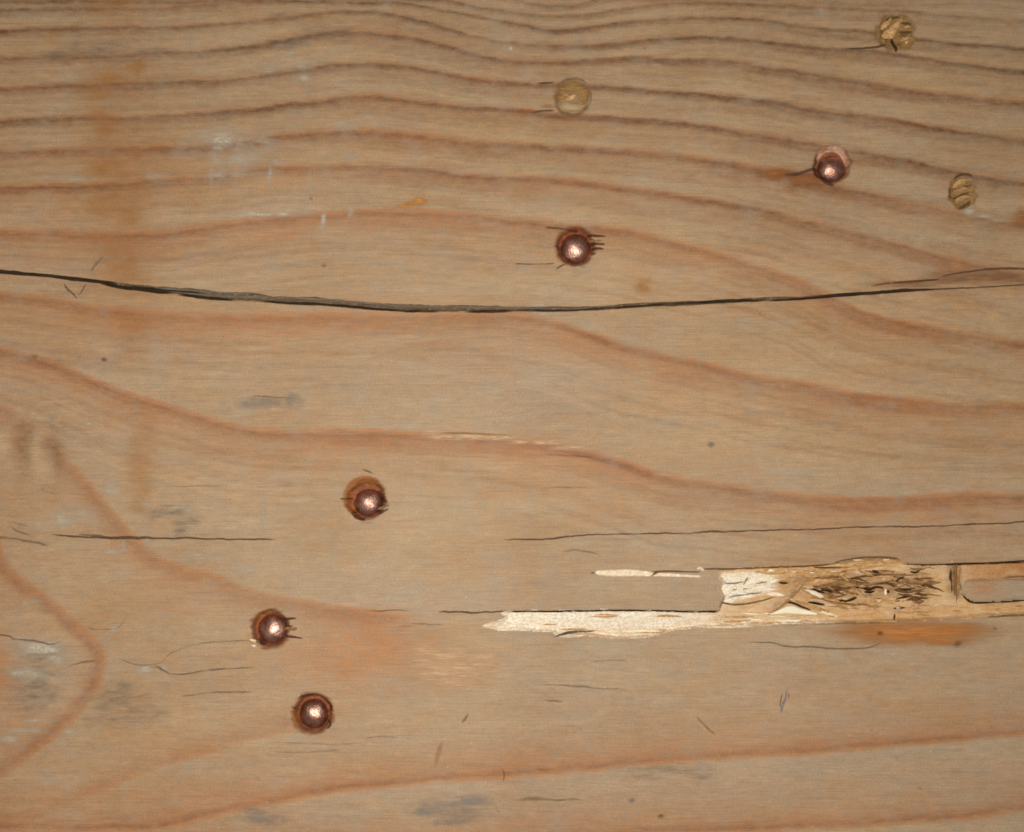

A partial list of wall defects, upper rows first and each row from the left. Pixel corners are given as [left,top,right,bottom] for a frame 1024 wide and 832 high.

crack [0,259,1024,313]
crack [59,533,271,541]
crack [511,521,1024,540]
spalling [483,556,1024,639]